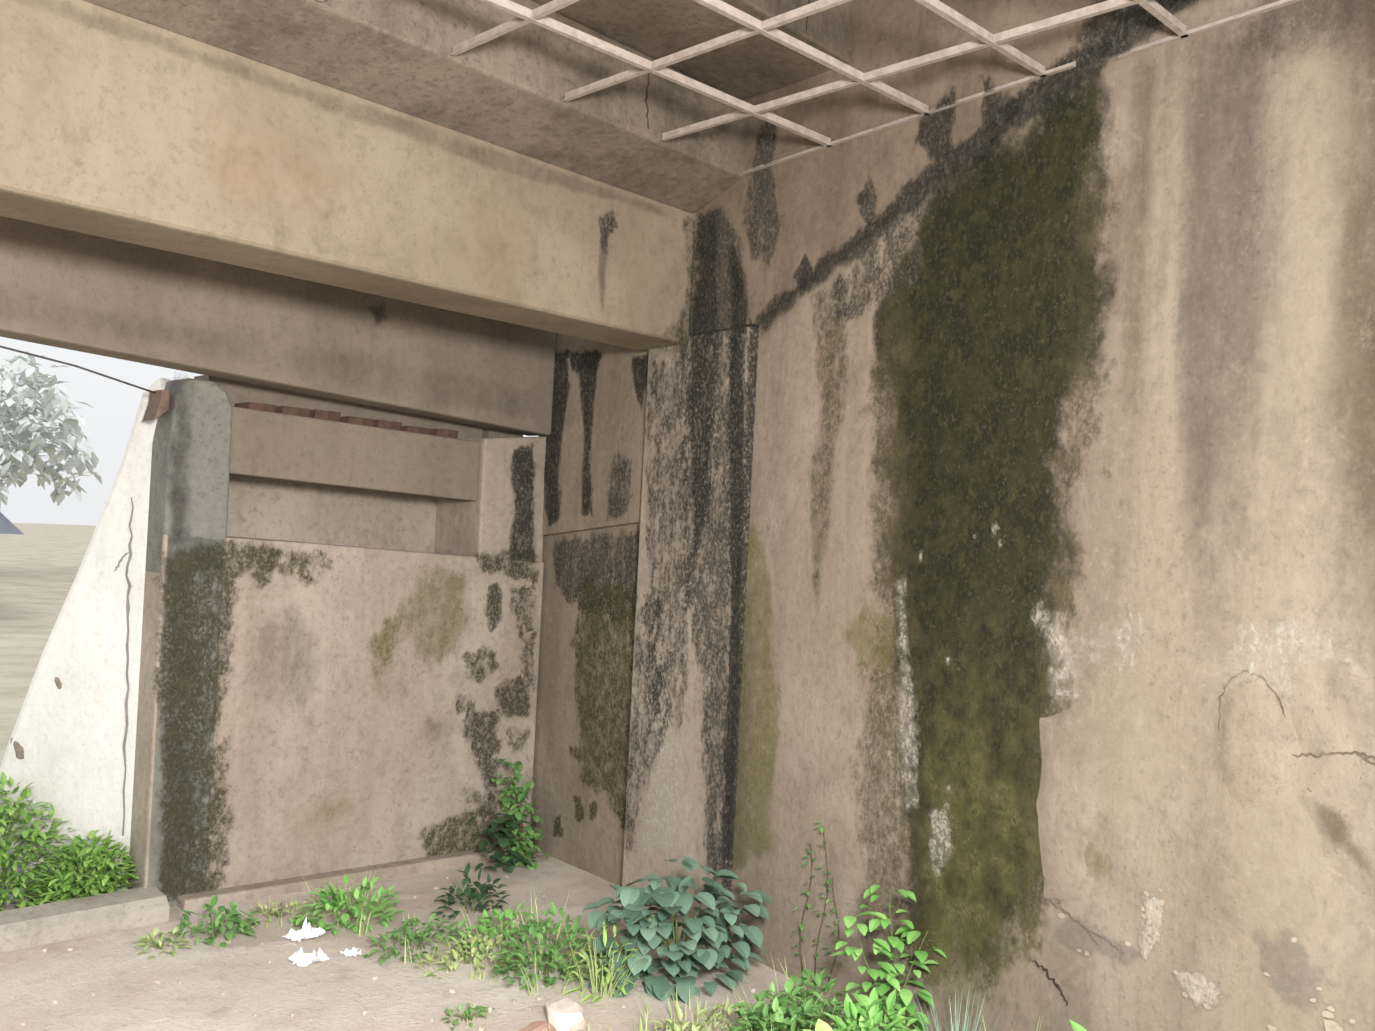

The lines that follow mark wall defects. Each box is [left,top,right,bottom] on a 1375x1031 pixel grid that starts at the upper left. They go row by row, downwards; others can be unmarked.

leakage [456,0,1195,983]
mould [155,540,329,900]
crack [1218,670,1287,730]
crack [1292,751,1375,792]